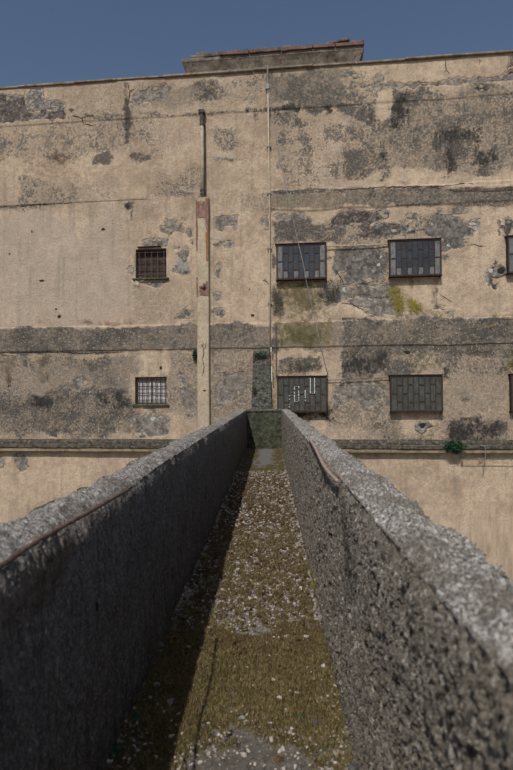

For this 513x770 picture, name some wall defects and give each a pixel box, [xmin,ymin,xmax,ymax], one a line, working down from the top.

peeling [342,57,513,93]
crack [27,89,97,126]
leakage [122,82,133,144]
leakage [388,88,409,128]
leakage [434,126,499,177]
peeling [485,260,499,290]
leakage [271,284,286,315]
leakage [277,357,319,376]
leakage [341,350,389,376]
leakage [28,392,53,408]
leakage [295,402,338,423]
leakage [445,416,503,440]